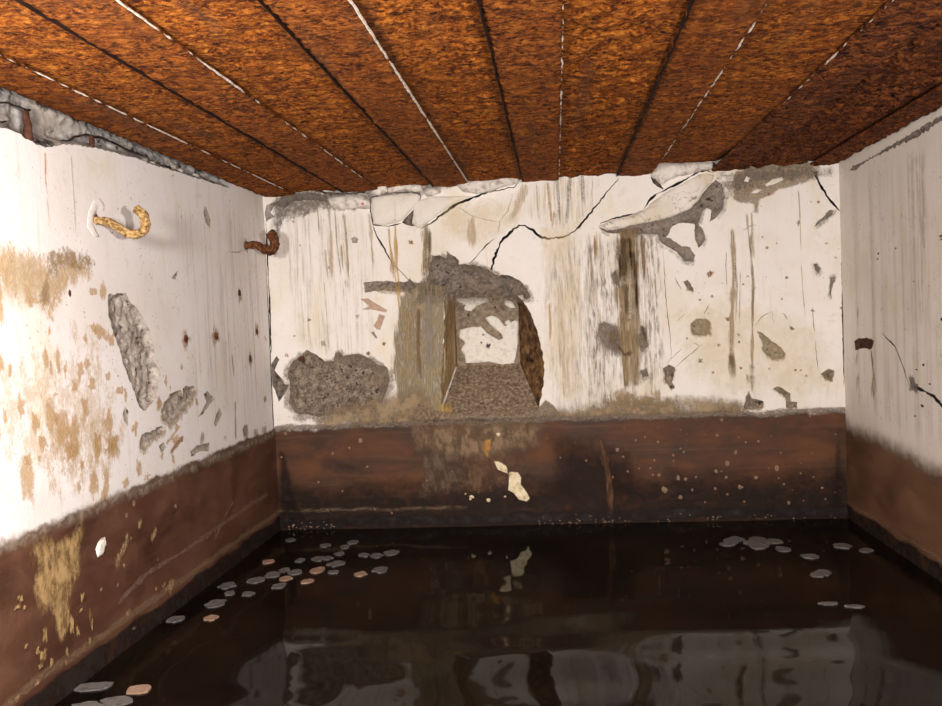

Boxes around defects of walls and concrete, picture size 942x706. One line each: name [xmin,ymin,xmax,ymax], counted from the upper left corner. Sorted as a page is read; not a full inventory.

spalling [0,87,229,188]
water stain [547,5,584,222]
crack [316,170,714,280]
spalling [599,162,816,262]
crack [813,171,840,211]
spalling [108,293,222,453]
spalling [263,350,394,423]
spalling [361,251,531,338]
crack [839,266,847,378]
crack [882,333,942,407]
water stain [0,209,942,706]